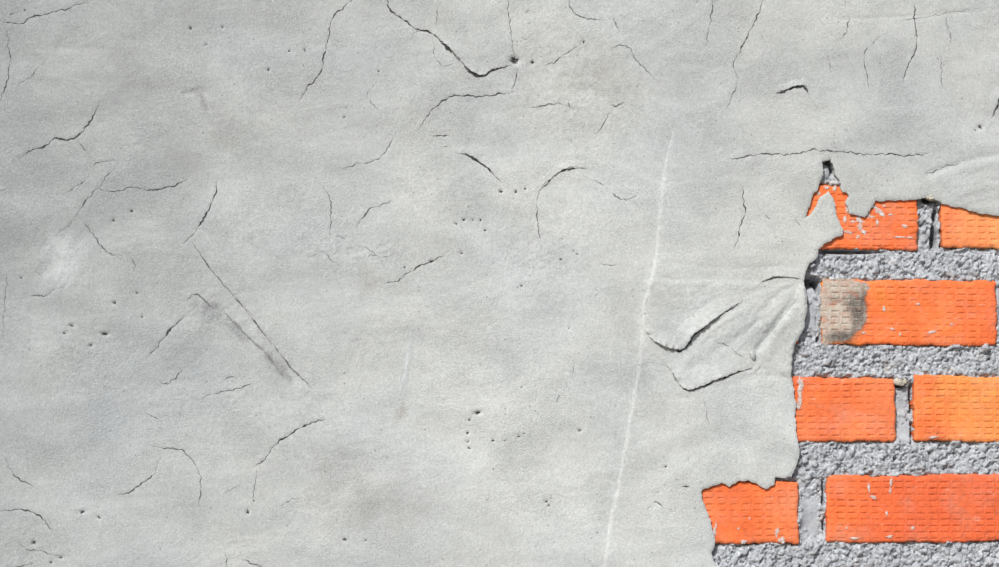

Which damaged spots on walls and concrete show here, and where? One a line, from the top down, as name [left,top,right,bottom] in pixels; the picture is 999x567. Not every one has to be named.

crack [0,4,75,100]
crack [301,0,352,98]
crack [387,0,440,63]
crack [423,6,531,147]
crack [26,110,185,243]
spalling [817,161,837,195]
crack [734,148,951,173]
crack [190,182,217,237]
peeling [843,204,892,238]
peeling [756,266,801,282]
peeling [796,377,804,409]
crack [258,420,322,464]